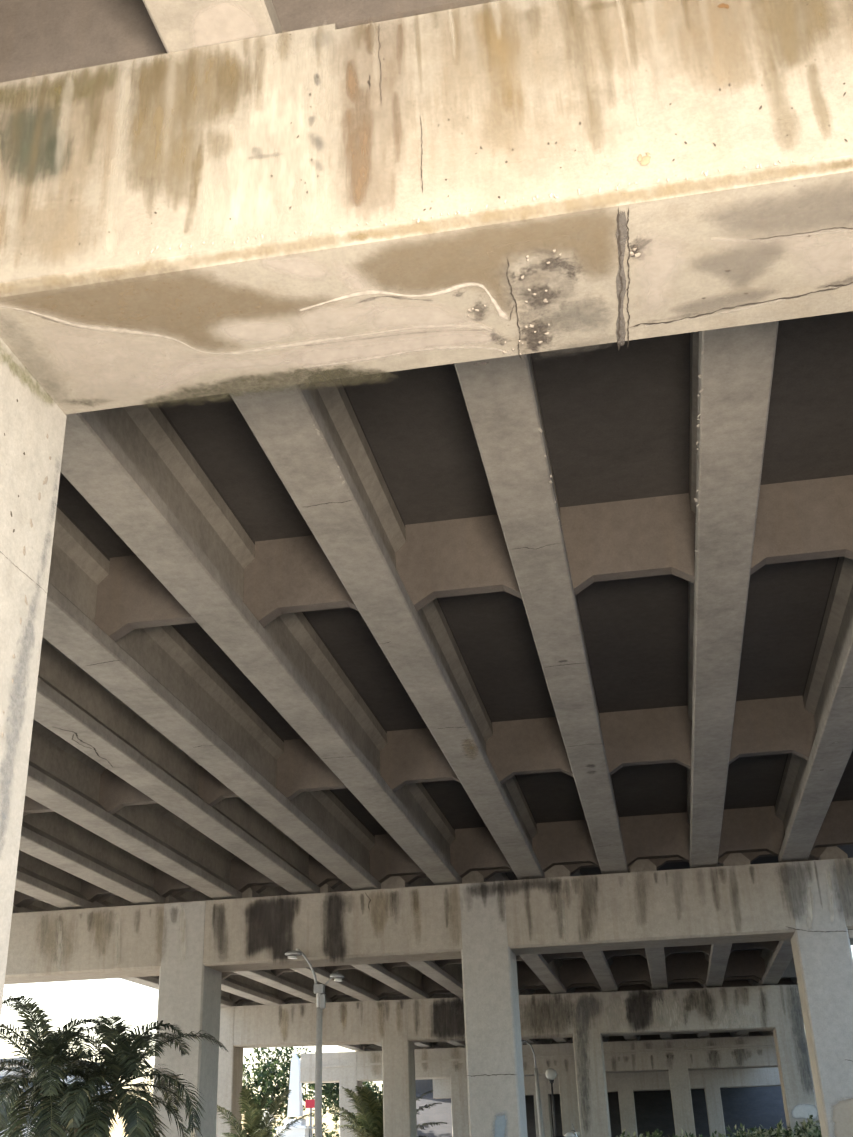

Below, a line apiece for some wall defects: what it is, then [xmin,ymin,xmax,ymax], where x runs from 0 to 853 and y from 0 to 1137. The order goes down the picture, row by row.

damp [0,54,239,180]
crack [617,207,853,350]